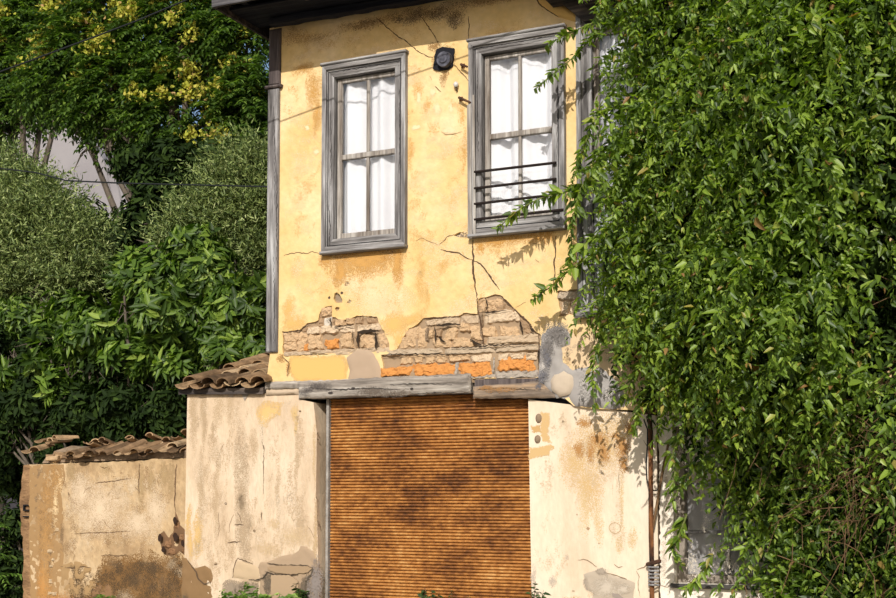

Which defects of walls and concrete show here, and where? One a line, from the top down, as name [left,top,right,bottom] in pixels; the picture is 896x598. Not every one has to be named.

crack [377,14,441,92]
spalling [283,282,541,383]
crack [418,235,536,332]
spalling [557,290,577,317]
water stain [32,394,318,598]
spalling [158,512,217,598]
spalling [249,546,324,598]